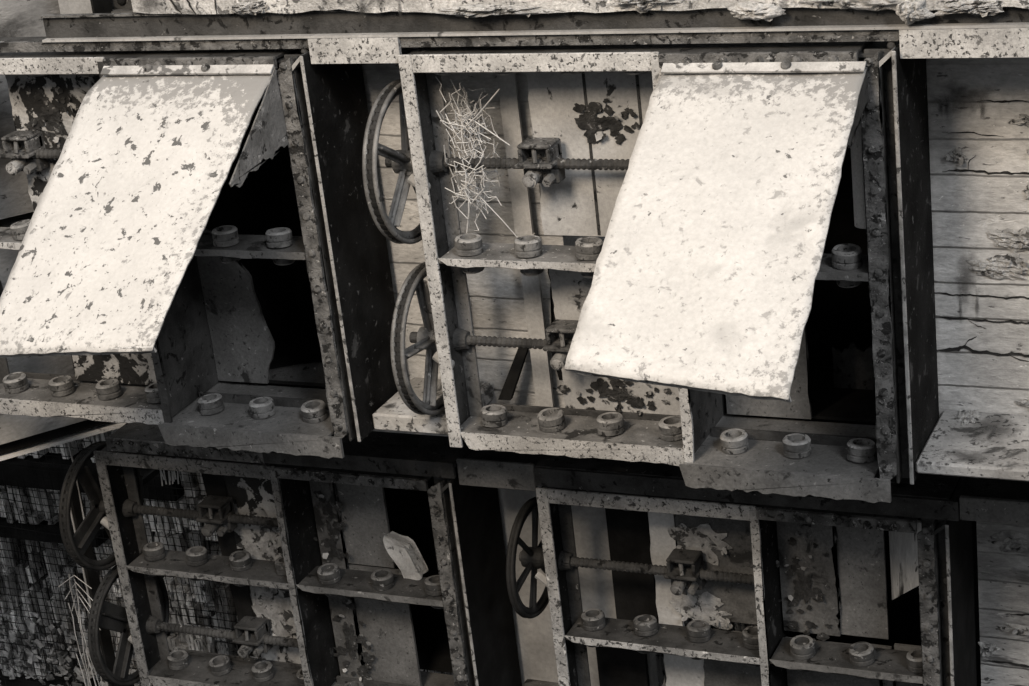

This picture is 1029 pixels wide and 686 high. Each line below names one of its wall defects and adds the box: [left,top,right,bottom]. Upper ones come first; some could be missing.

spalling [610,0,683,13]
spalling [799,0,904,11]
spalling [933,0,1004,17]
peeling [24,86,79,145]
peeling [573,99,640,145]